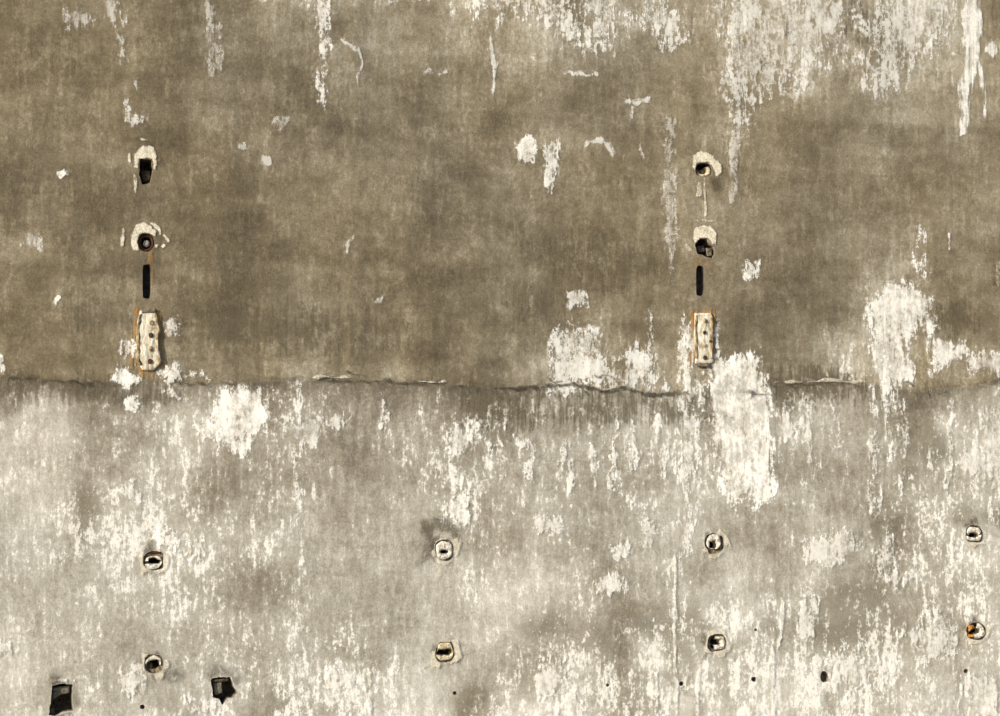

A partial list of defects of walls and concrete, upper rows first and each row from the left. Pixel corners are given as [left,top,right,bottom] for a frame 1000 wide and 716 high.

peeling [314,0,363,107]
peeling [490,37,498,93]
peeling [470,0,690,58]
peeling [716,0,957,125]
crack [2,376,114,386]
crack [317,370,463,387]
crack [493,374,689,398]
peeling [863,228,1000,514]
peeling [535,513,563,536]
peeling [547,290,812,716]
peeling [802,527,918,590]
peeling [796,594,819,639]